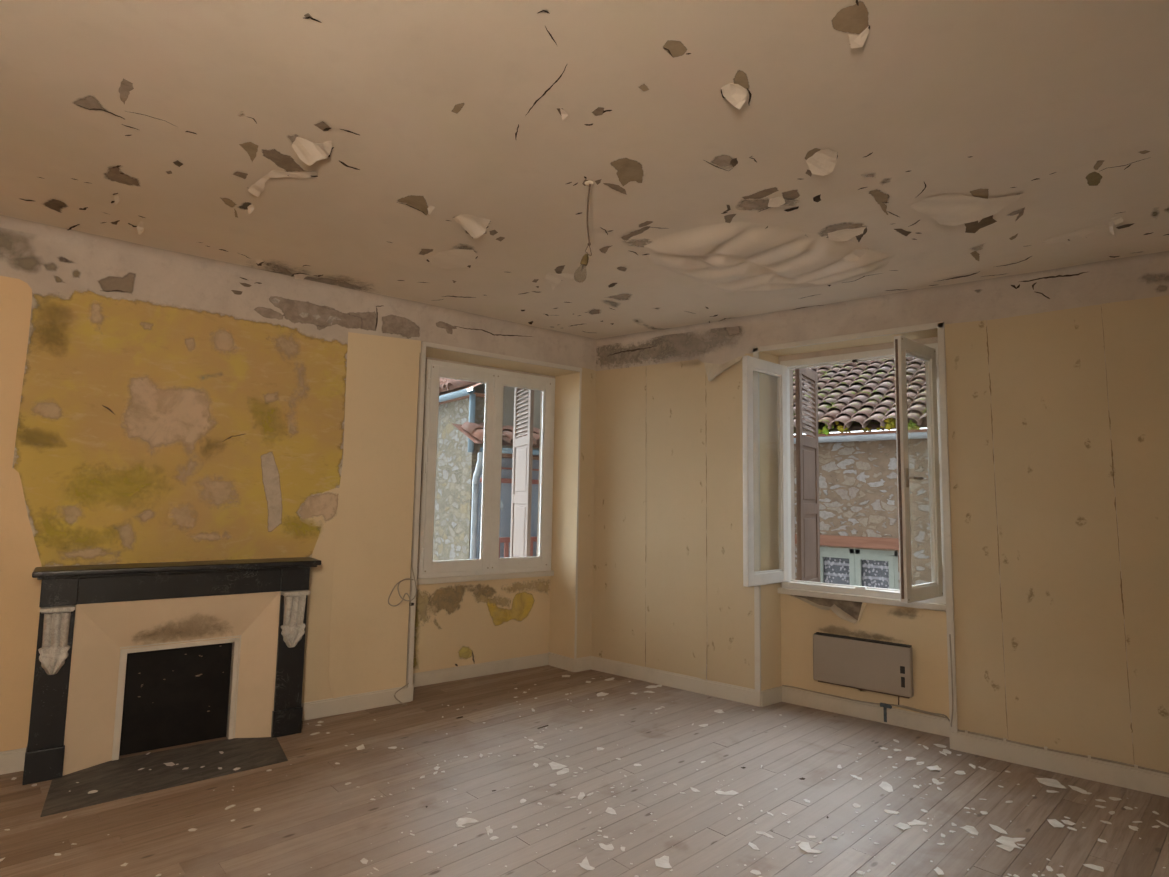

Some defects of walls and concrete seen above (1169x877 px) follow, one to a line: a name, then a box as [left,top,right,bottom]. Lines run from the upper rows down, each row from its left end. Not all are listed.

peeling [832,0,870,48]
peeling [74,79,134,119]
crack [515,10,567,138]
water stain [0,232,80,282]
peeling [821,223,867,242]
water stain [13,273,348,566]
flaking render [261,452,282,532]